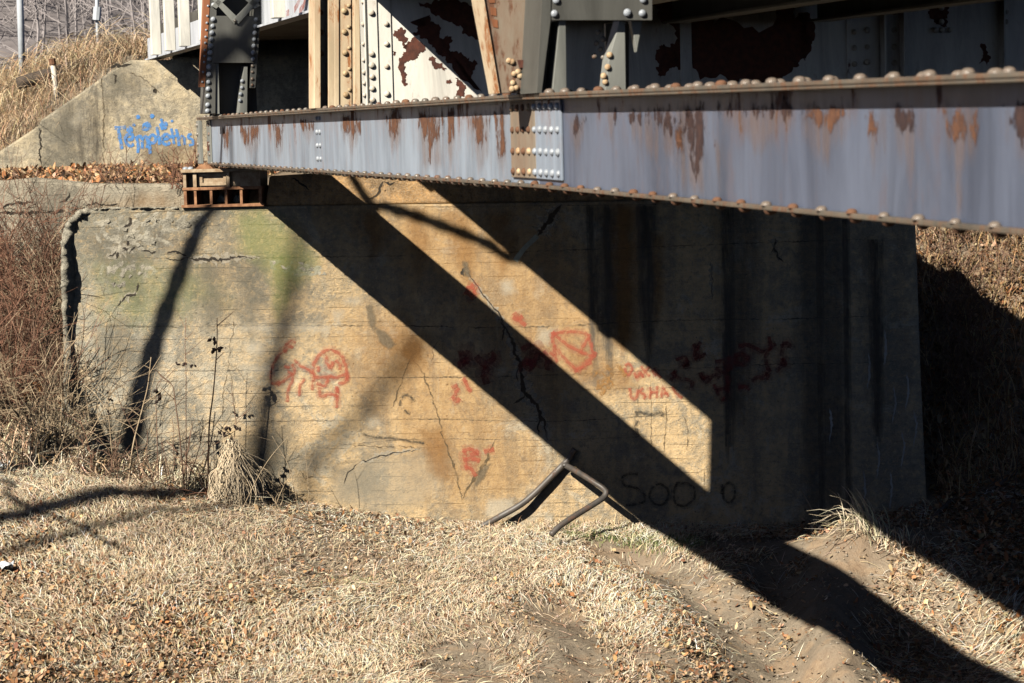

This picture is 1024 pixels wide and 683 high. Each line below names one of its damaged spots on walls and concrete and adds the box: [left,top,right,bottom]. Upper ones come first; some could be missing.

peeling [393,0,482,97]
peeling [653,1,815,83]
corrosion [386,109,398,136]
corrosion [418,107,454,161]
corrosion [472,111,506,158]
corrosion [613,101,715,180]
corrosion [1003,102,1024,147]
crack [0,193,260,265]
crack [532,203,562,236]
spalling [60,206,211,416]
crack [460,268,548,439]
crack [344,346,493,504]